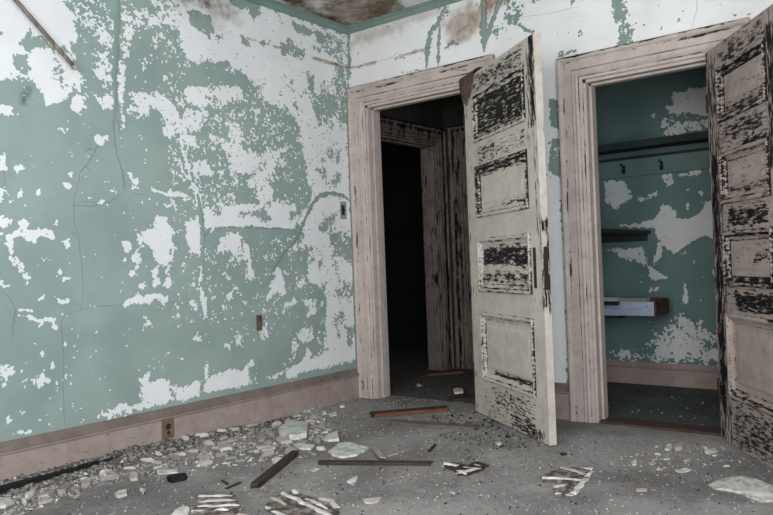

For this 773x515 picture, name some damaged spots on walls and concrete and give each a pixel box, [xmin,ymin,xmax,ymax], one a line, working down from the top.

water stain [283,0,400,25]
peeling [492,0,539,41]
crack [61,0,144,420]
peeling [0,0,360,382]
crack [171,191,351,309]
peeling [604,180,657,210]
peeling [607,188,713,293]
peeling [662,169,710,187]
peeling [609,283,718,366]
peeling [0,343,72,399]
peeling [97,359,257,420]